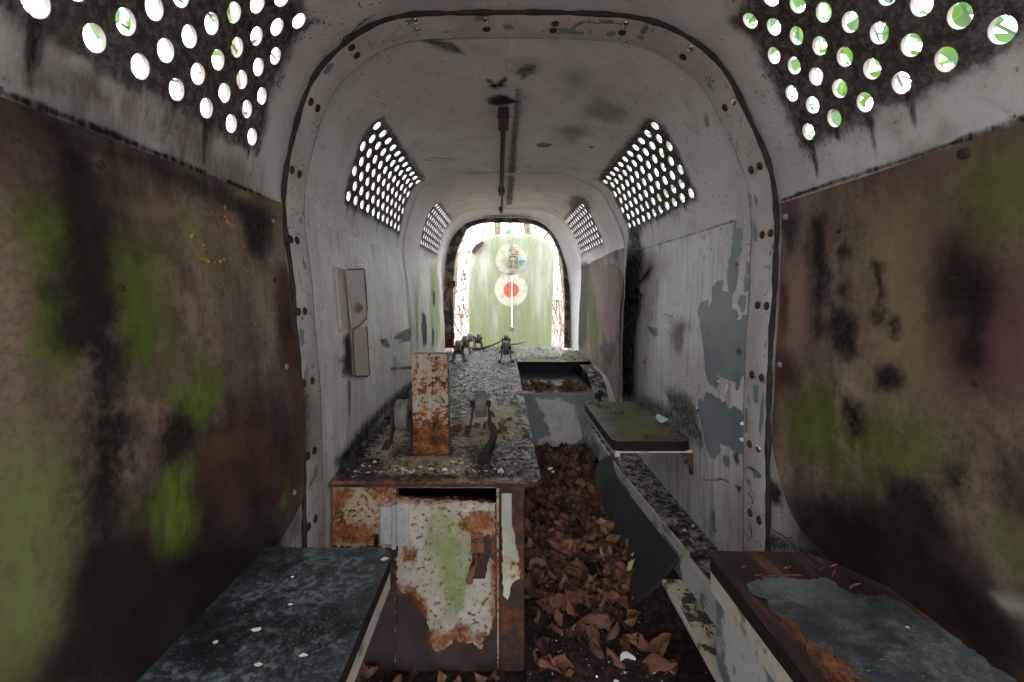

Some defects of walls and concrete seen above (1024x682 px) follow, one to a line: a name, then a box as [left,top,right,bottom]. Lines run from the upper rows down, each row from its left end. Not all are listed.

water stain [0,0,321,682]
water stain [563,114,736,456]
peeling [696,194,764,479]
water stain [723,0,1024,394]
rust [330,487,501,654]
water stain [768,361,1024,682]